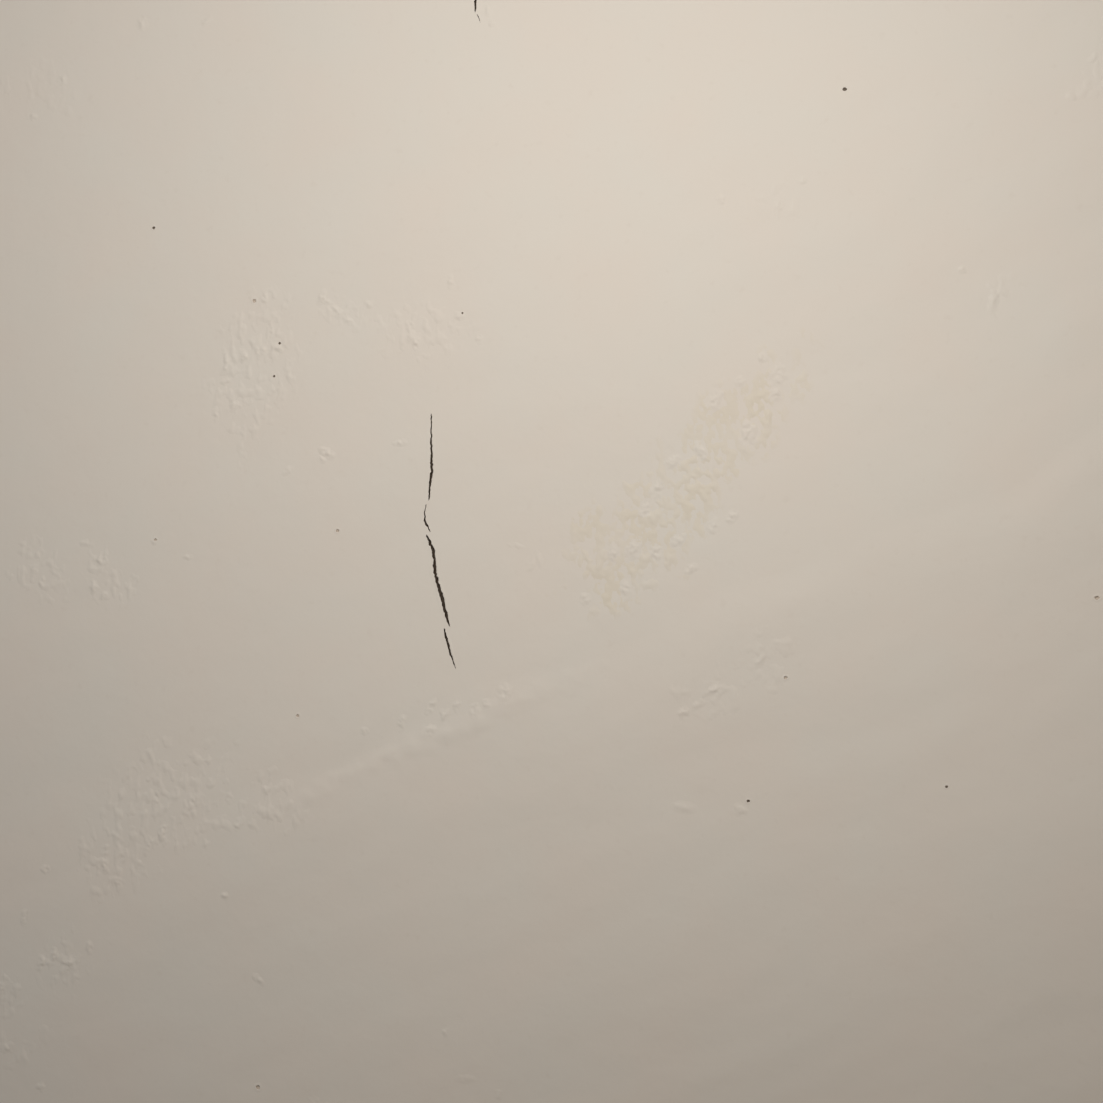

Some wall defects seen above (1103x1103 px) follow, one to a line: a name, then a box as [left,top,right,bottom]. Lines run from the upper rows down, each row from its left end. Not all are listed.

crack [473,0,481,23]
crack [424,414,457,669]